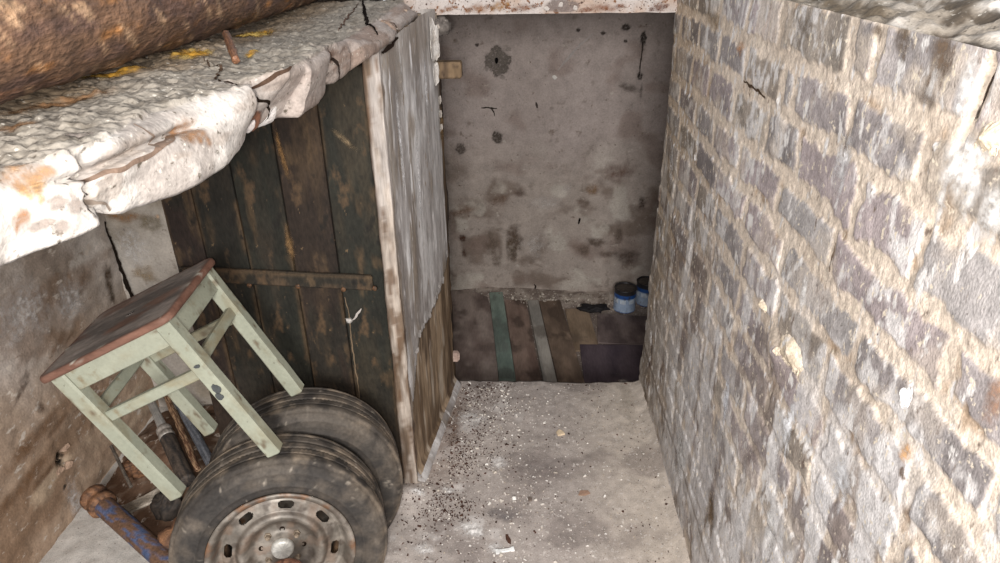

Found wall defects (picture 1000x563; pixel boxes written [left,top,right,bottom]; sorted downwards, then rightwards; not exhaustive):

crack [338,0,378,35]
crack [203,56,292,119]
rust [5,167,54,202]
crack [83,193,134,298]